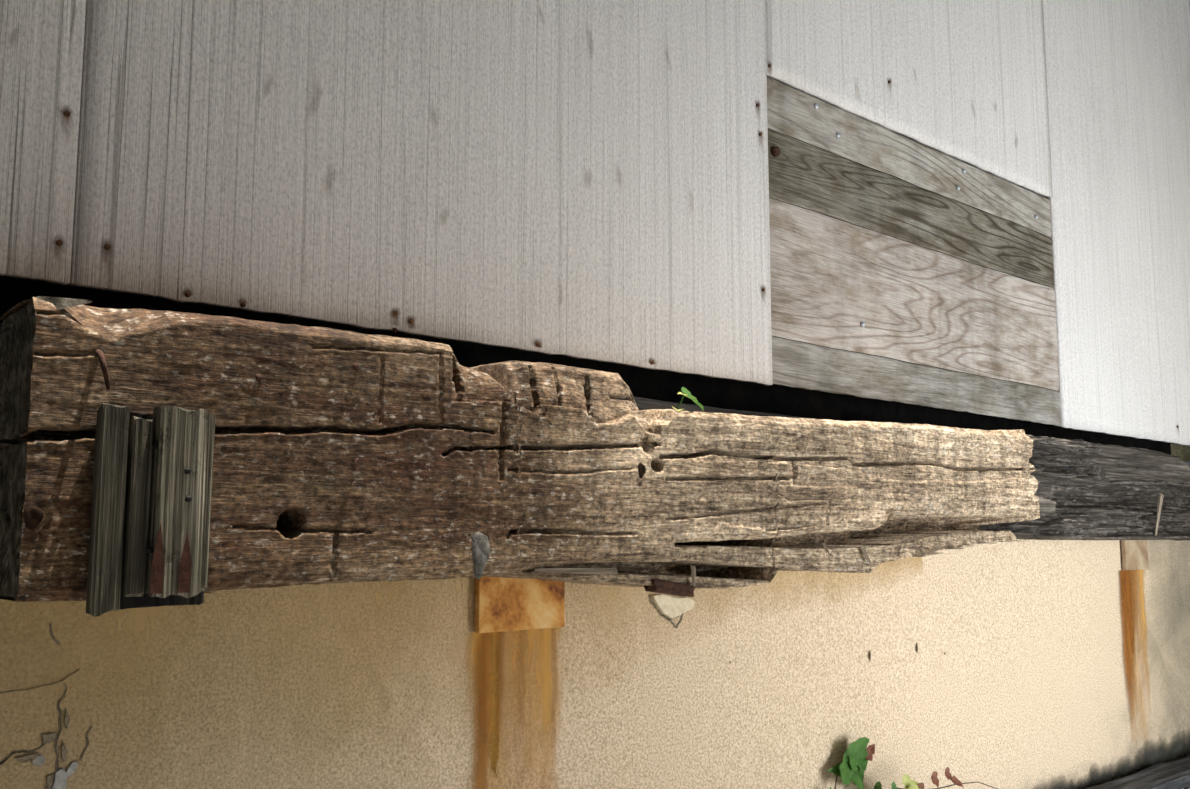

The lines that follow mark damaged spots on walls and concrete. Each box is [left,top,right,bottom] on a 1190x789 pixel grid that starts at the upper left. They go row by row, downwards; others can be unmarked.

crack [48,623,61,645]
rust [1120,570,1146,693]
crack [0,683,93,789]
rust [471,628,554,789]